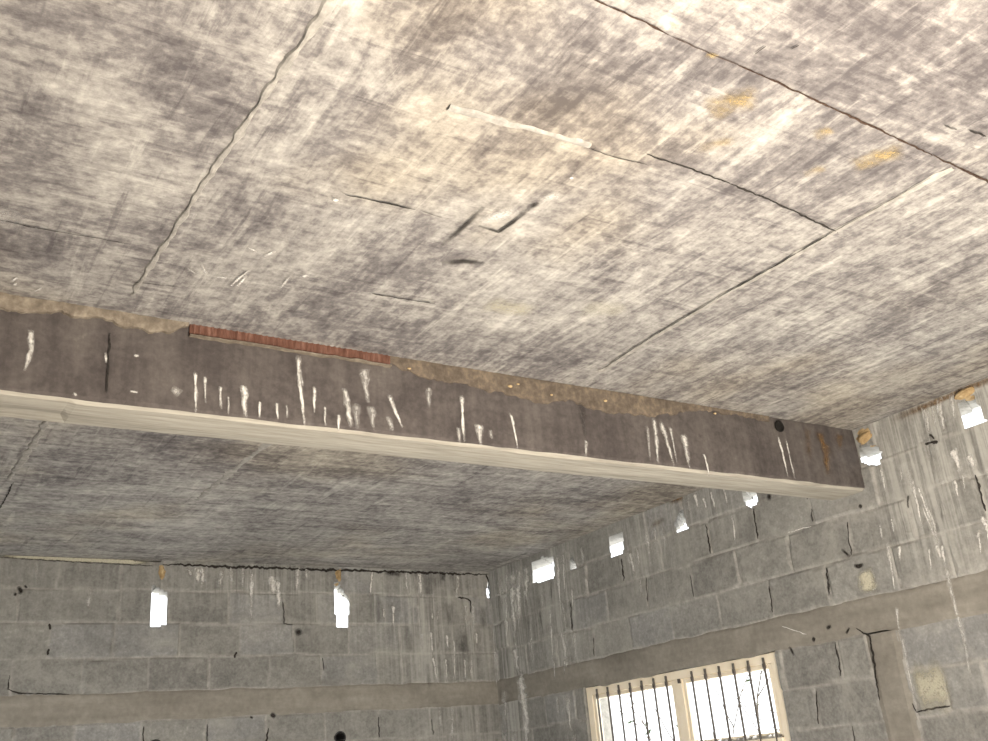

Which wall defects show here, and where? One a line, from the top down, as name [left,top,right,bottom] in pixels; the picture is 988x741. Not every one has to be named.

crack [589,0,988,367]
crack [1,220,125,244]
rust [189,324,392,368]
damp [297,359,326,420]
spalling [390,356,770,422]
damp [654,421,688,458]